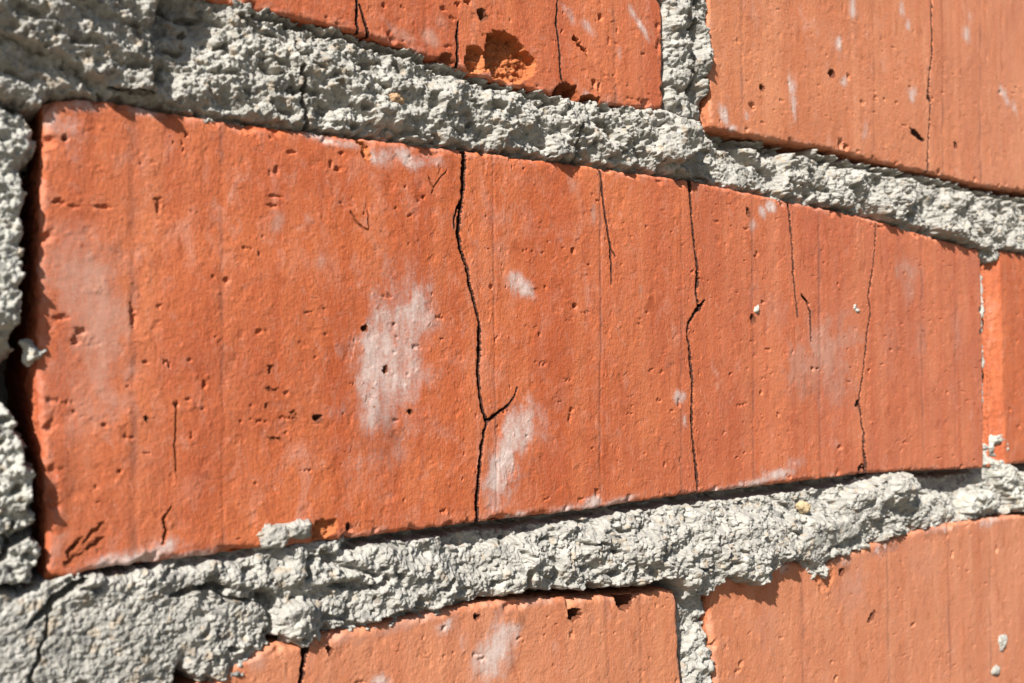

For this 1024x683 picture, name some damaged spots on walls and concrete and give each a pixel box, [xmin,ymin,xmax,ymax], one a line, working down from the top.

spalling [434,29,536,85]
crack [553,0,588,92]
crack [569,121,616,285]
damp [359,291,429,427]
crack [428,151,518,522]
crack [686,181,734,551]
crack [854,223,877,474]
damp [487,411,532,491]